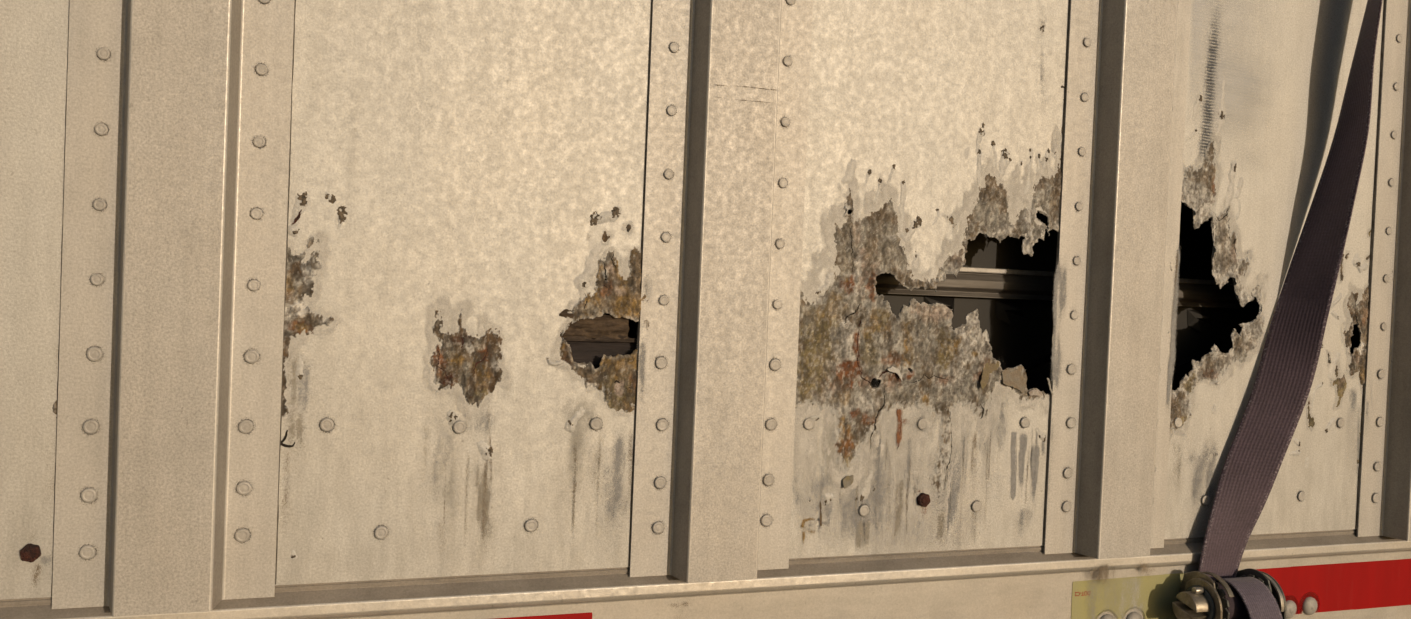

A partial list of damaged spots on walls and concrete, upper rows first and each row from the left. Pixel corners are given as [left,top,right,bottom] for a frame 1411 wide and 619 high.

corrosion [422,294,513,418]
corrosion [795,19,1065,518]
damp [1050,257,1068,390]
damp [410,397,497,561]
damp [790,384,1055,563]